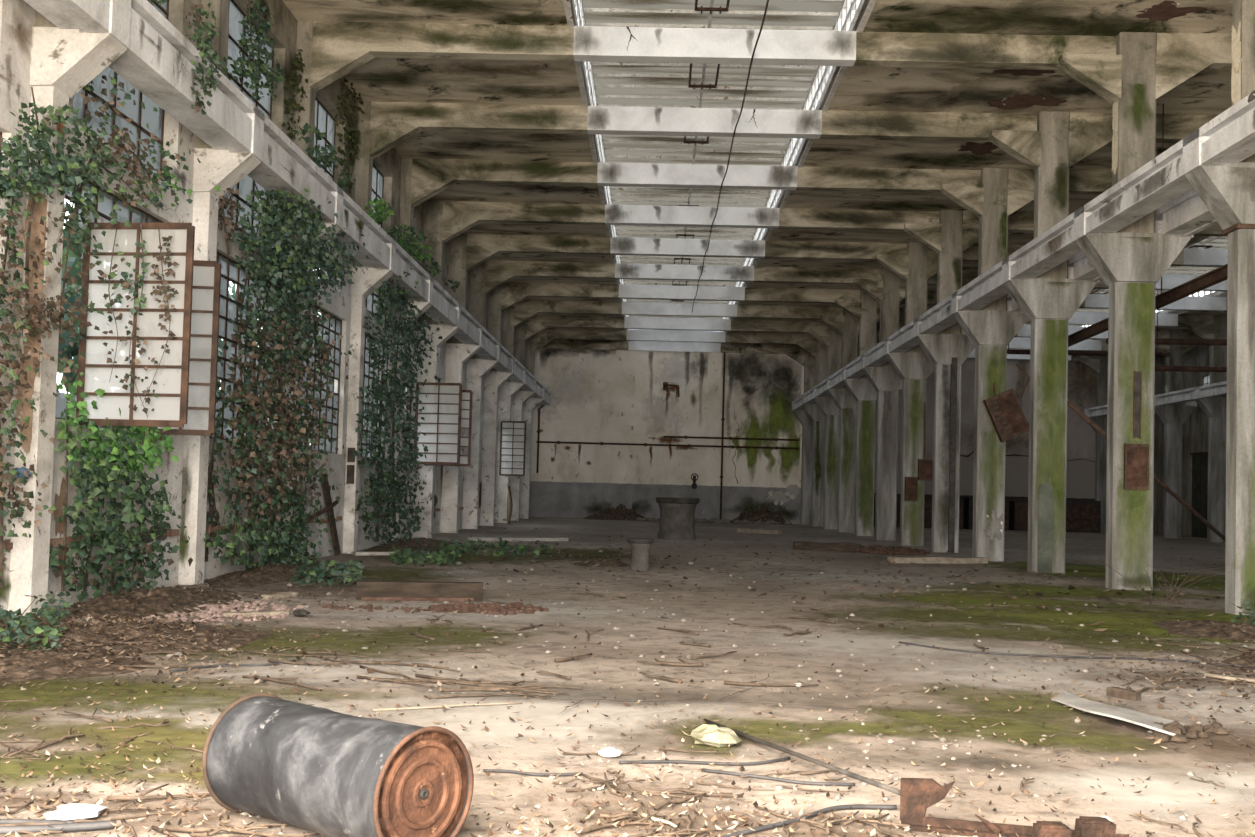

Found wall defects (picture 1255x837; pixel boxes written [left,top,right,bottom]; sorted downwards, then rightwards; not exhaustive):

leakage [413,0,554,50]
leakage [362,72,417,85]
leakage [405,107,446,117]
leakage [505,111,568,140]
leakage [841,90,1013,130]
leakage [1046,79,1097,96]
leakage [1132,84,1150,126]
leakage [825,153,1000,177]
leakage [1135,158,1180,195]
leakage [816,202,948,222]
leakage [729,356,795,415]
leakage [732,437,800,477]